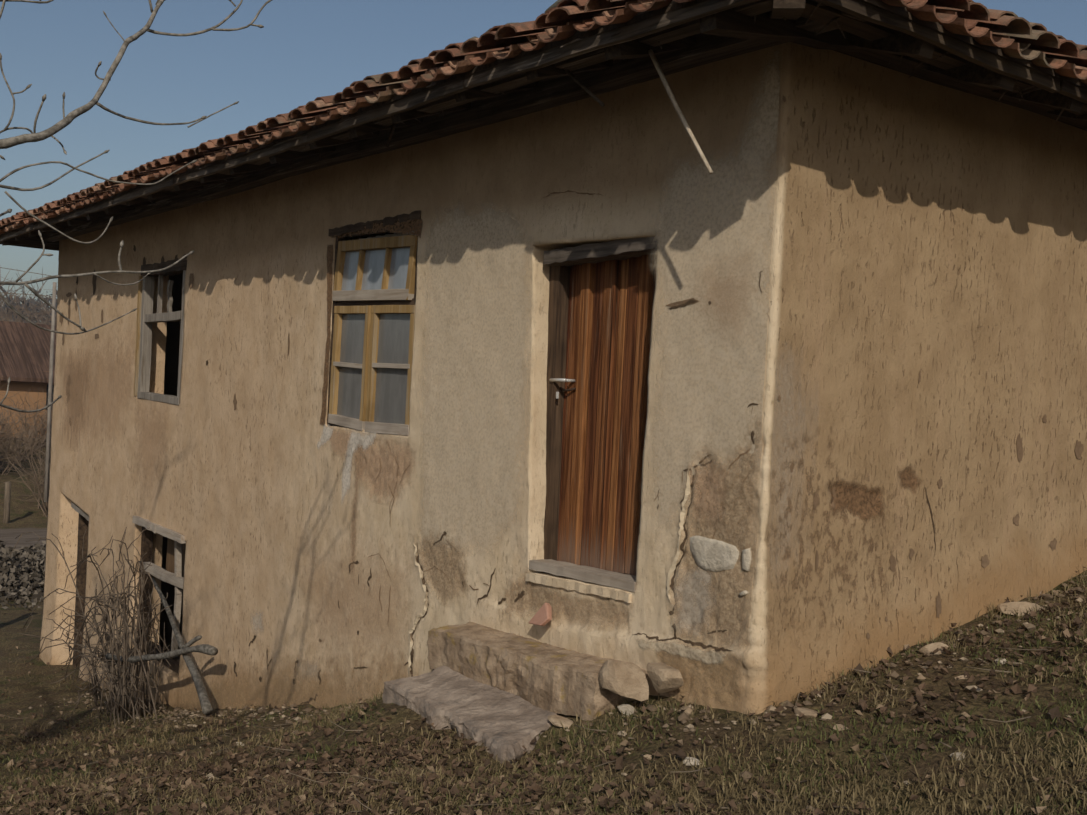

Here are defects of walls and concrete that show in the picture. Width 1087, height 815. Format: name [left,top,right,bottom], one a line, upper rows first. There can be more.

leakage [342,432,376,555]
crack [349,534,527,677]
spalling [421,541,465,599]
crack [634,403,758,651]
spalling [673,442,757,646]